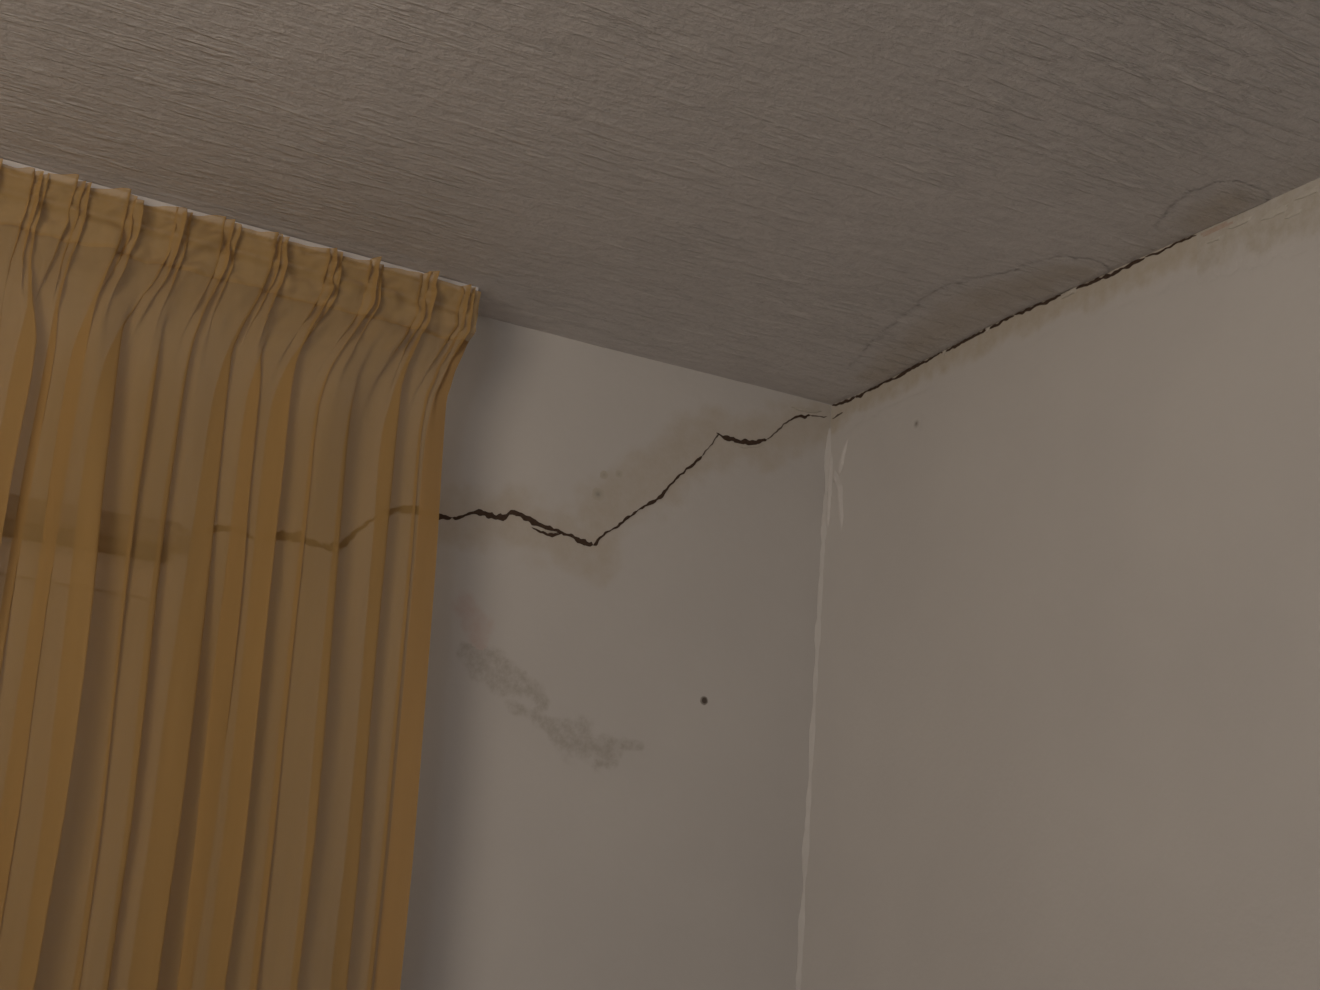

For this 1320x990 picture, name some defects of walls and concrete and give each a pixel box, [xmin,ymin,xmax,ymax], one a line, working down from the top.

crack [439,235,1196,547]